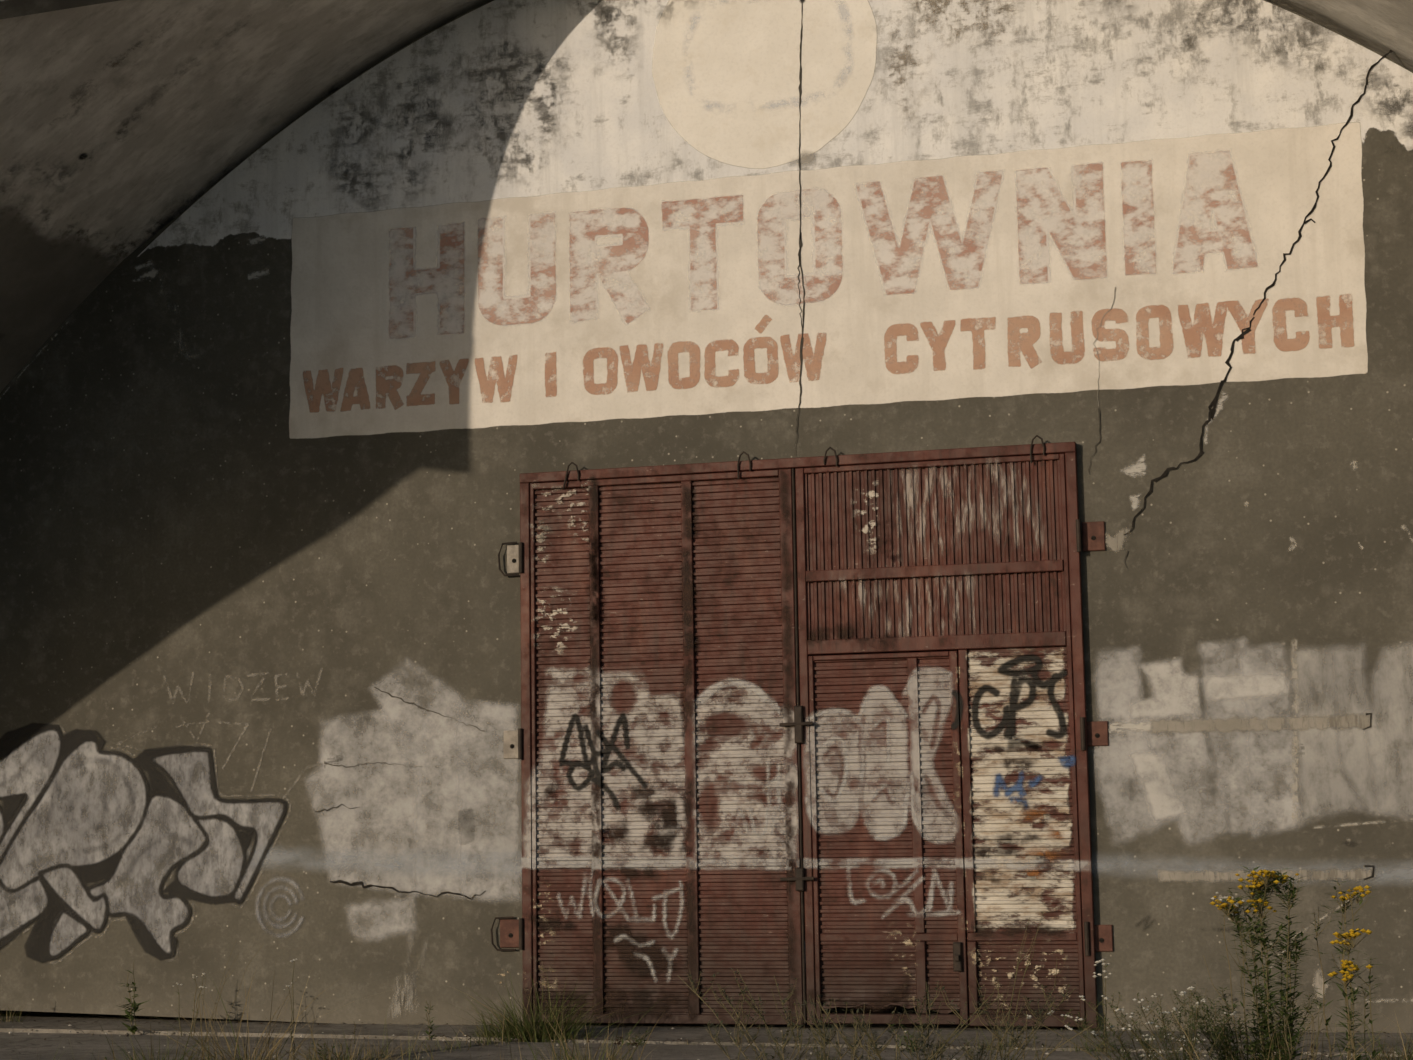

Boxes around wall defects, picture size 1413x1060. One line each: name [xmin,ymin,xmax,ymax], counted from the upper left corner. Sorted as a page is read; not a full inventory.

damp [597,1,625,53]
damp [915,0,1010,36]
damp [1219,0,1317,54]
damp [475,42,555,132]
damp [889,45,919,83]
damp [1380,81,1412,115]
damp [481,120,530,169]
crack [795,0,805,451]
crack [1124,50,1393,567]
crack [330,880,485,899]